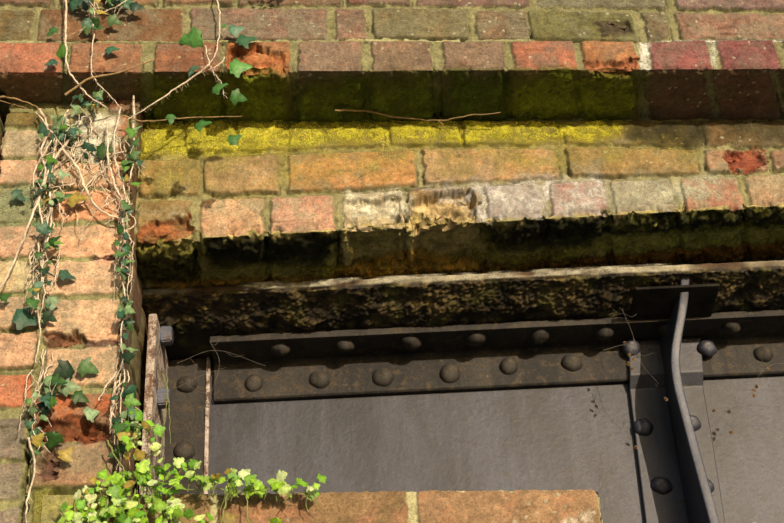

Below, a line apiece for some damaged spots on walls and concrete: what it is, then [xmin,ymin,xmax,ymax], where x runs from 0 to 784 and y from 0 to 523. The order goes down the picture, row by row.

spalling [224,42,290,78]
leakage [690,39,745,67]
leakage [141,42,652,157]
crack [0,88,11,174]
leakage [629,118,719,150]
spalling [721,144,770,176]
leakage [345,190,410,220]
spalling [342,187,504,272]
leakage [439,177,784,251]
leakage [203,232,337,269]
leakage [137,256,197,285]
spalling [33,412,114,484]